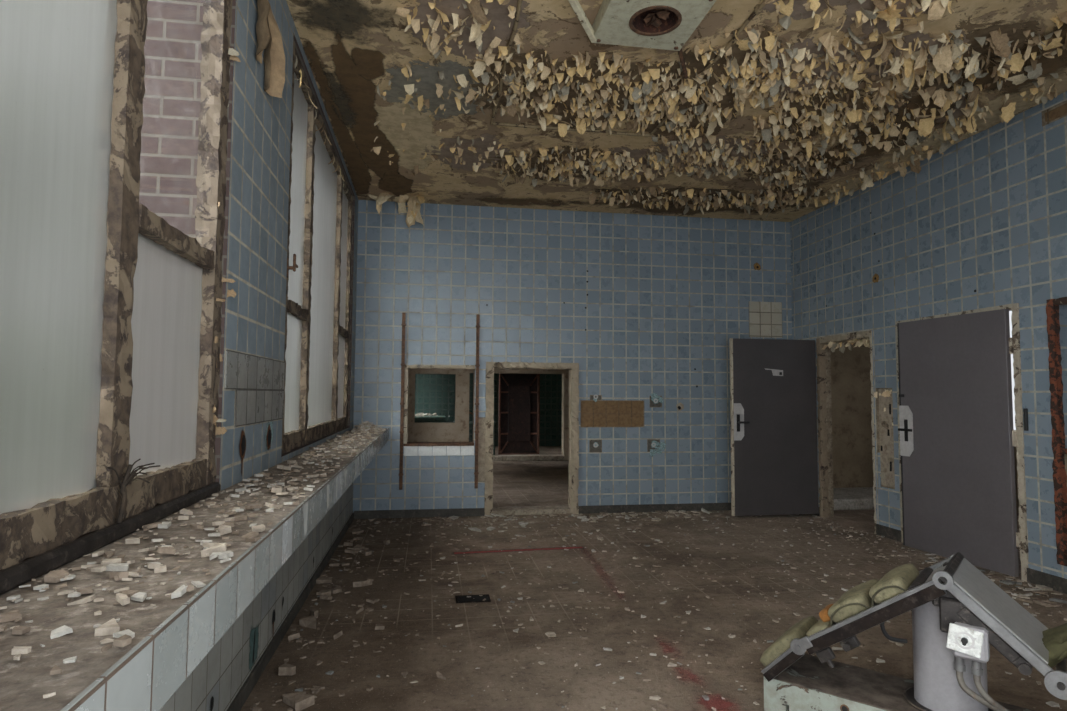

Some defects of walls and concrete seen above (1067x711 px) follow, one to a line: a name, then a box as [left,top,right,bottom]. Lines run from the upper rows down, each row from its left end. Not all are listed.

peeling [256,0,349,194]
peeling [371,0,1067,217]